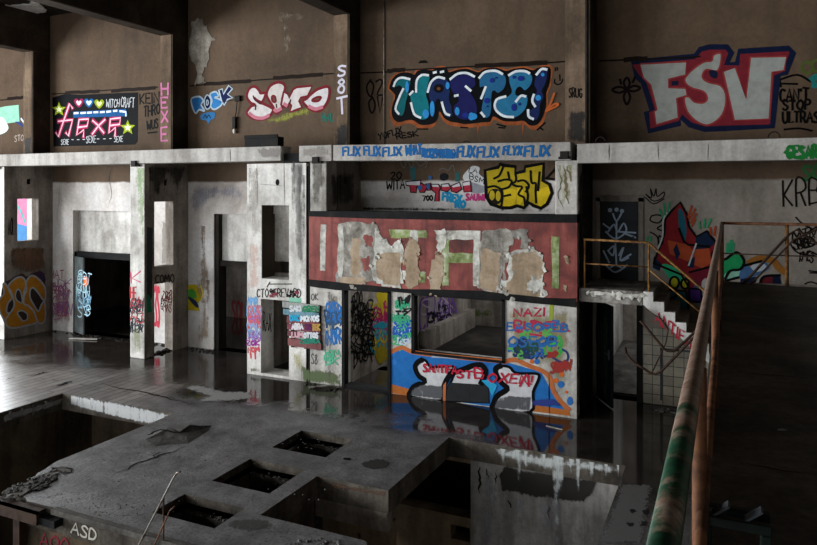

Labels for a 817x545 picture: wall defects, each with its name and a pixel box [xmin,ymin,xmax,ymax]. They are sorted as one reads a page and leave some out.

spalling [189,18,216,86]
peeling [335,221,447,297]
peeling [477,228,548,302]
crack [112,446,184,476]
leakage [486,449,619,524]